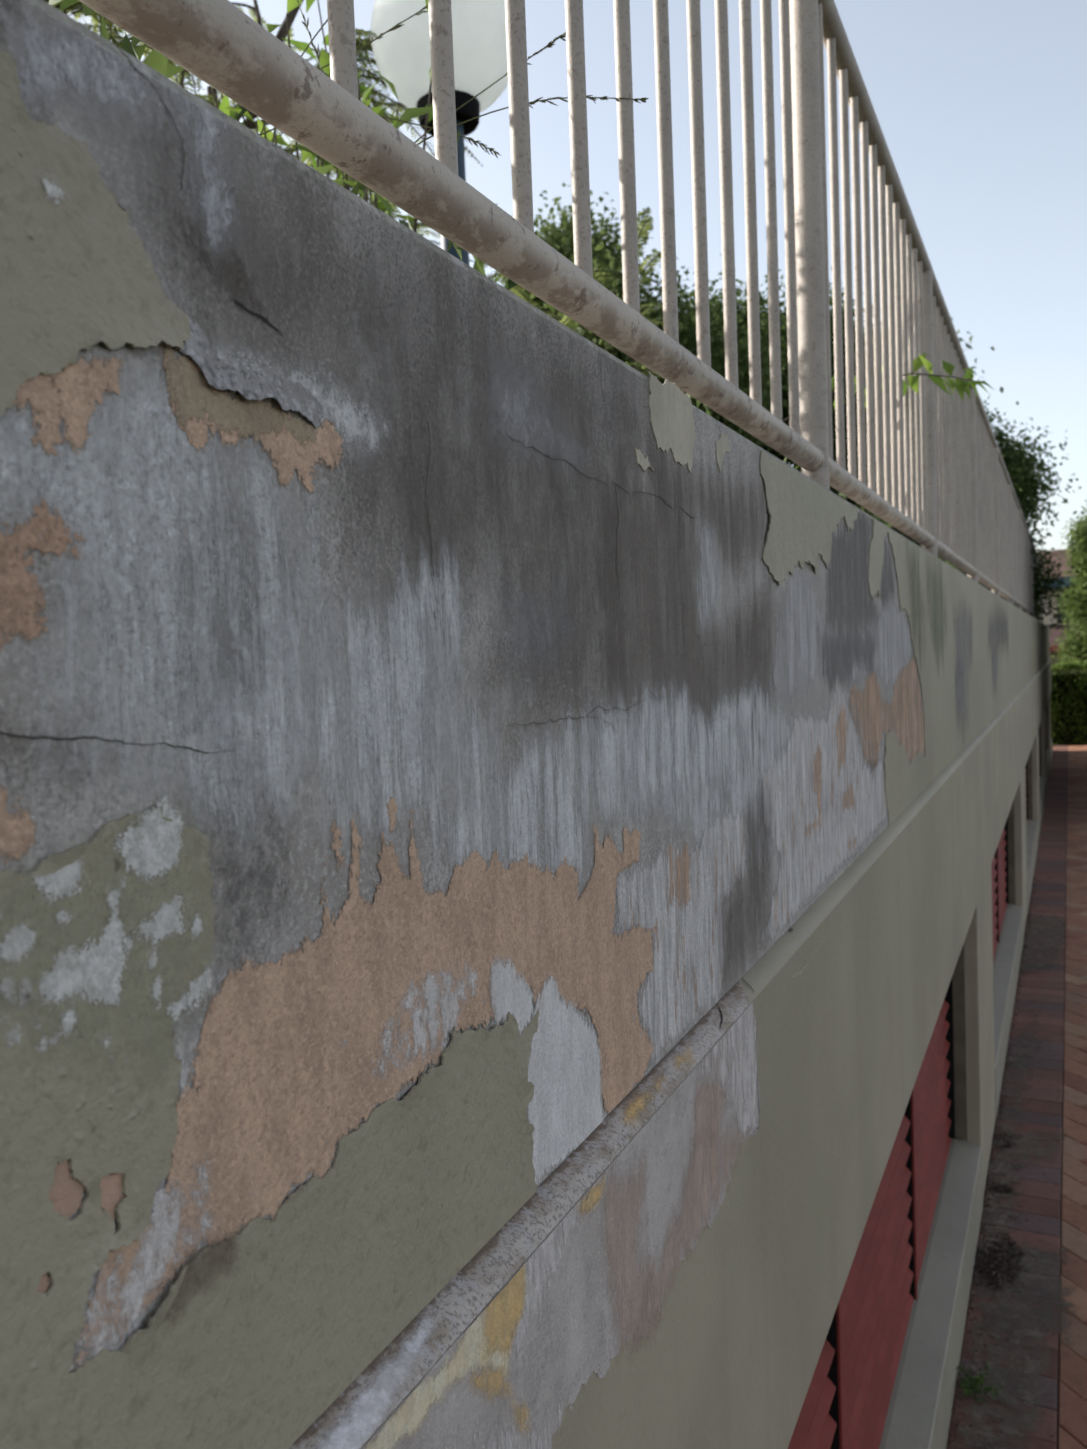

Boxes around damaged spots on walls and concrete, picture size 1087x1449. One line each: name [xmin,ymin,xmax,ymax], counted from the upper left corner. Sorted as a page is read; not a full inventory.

peeling [42,174,65,204]
crack [498,436,710,596]
crack [0,731,235,753]
peeling [813,749,822,809]
peeling [31,857,84,906]
peeling [0,923,36,1049]
peeling [35,877,186,1054]
peeling [48,1160,124,1221]
peeling [70,1221,155,1370]
peeling [606,1174,643,1338]
peeling [691,1057,725,1239]
peeling [366,1307,509,1449]